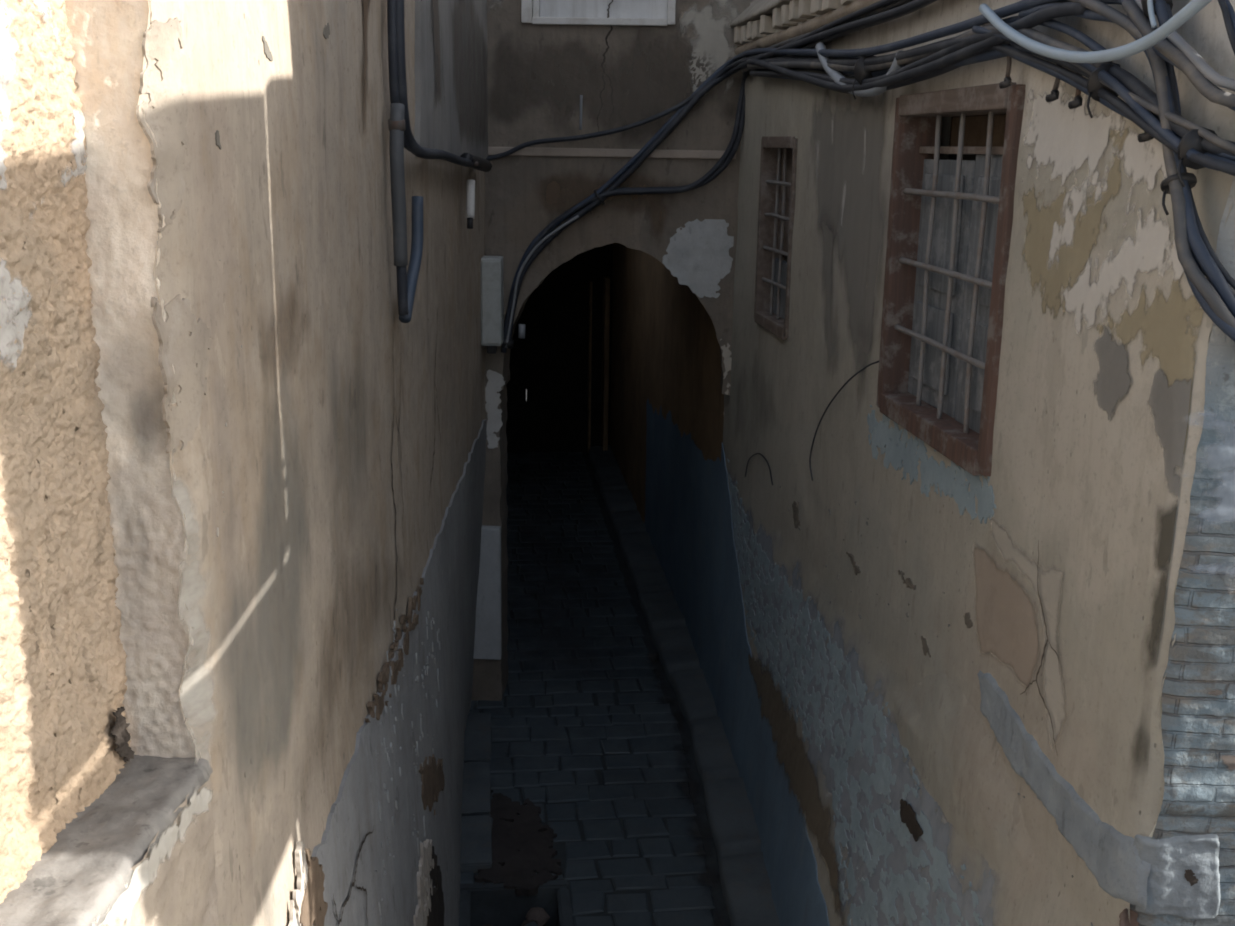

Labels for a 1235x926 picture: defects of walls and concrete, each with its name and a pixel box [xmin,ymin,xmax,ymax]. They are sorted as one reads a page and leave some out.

crack [603,0,613,64]
peeling [681,0,739,92]
spalling [136,17,189,233]
peeling [662,219,734,298]
peeling [1022,84,1203,497]
spalling [151,294,211,453]
crack [1021,540,1060,752]
spalling [748,654,844,926]
spalling [900,799,923,842]
spalling [288,841,328,926]
crack [333,829,374,926]